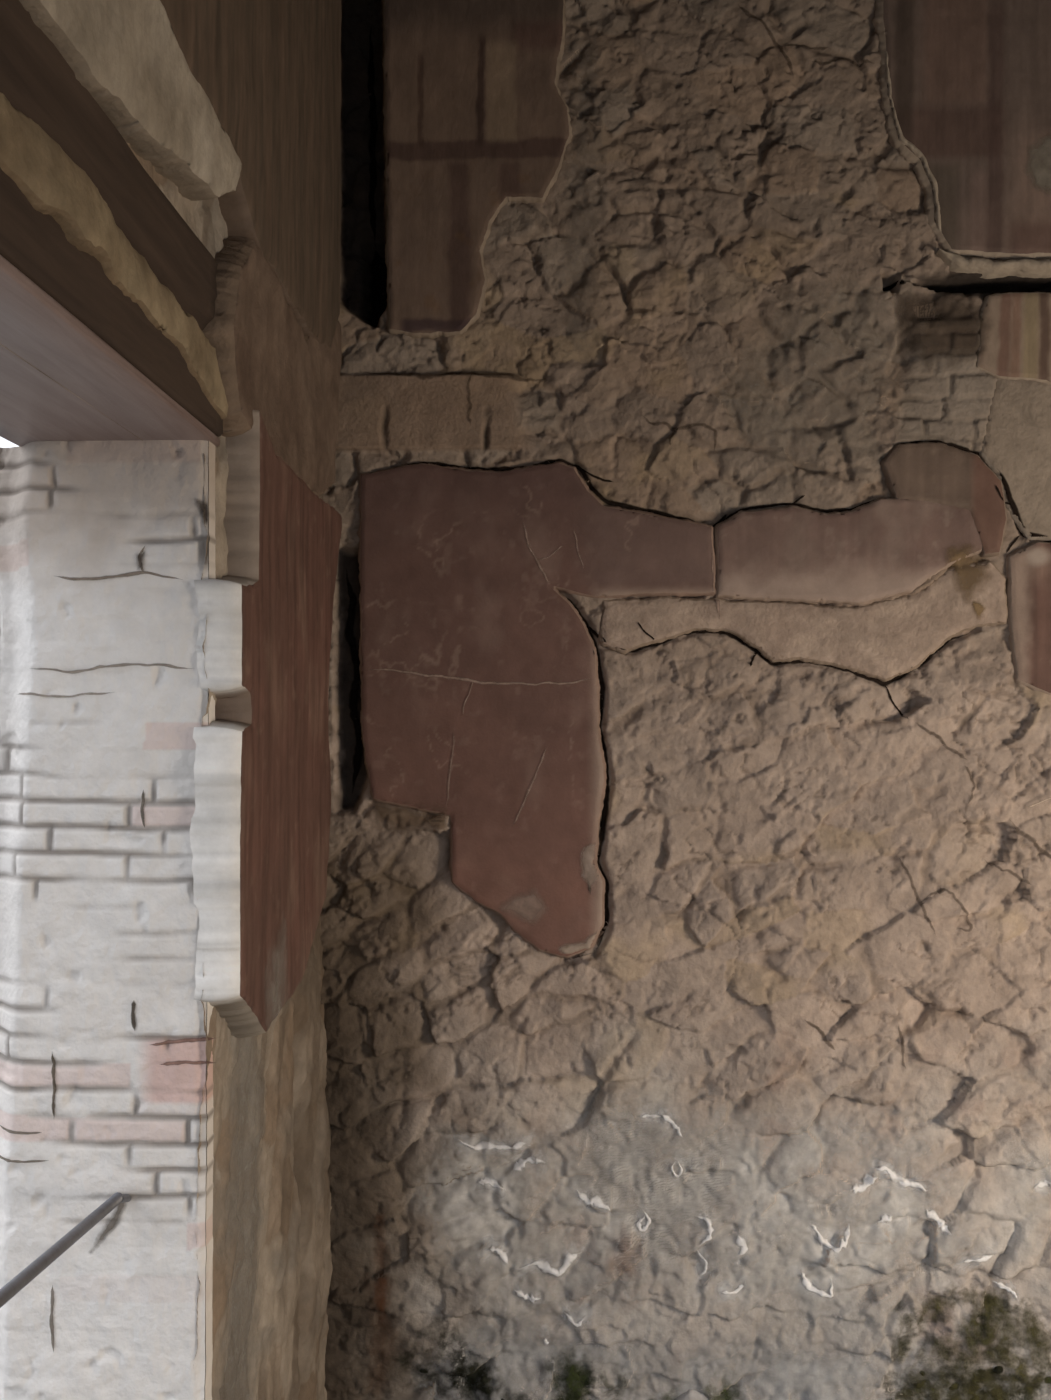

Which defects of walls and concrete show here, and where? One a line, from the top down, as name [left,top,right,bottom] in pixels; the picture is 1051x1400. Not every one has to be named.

crack [741,8,869,69]
spalling [884,51,942,232]
crack [883,280,906,292]
spalling [936,249,1051,279]
spalling [898,296,983,358]
crack [898,440,1051,553]
spalling [598,548,1008,682]
crack [345,459,975,957]
leakage [432,1112,993,1327]
leakage [426,1326,635,1400]
leakage [663,1352,874,1400]
leakage [938,1381,1051,1400]